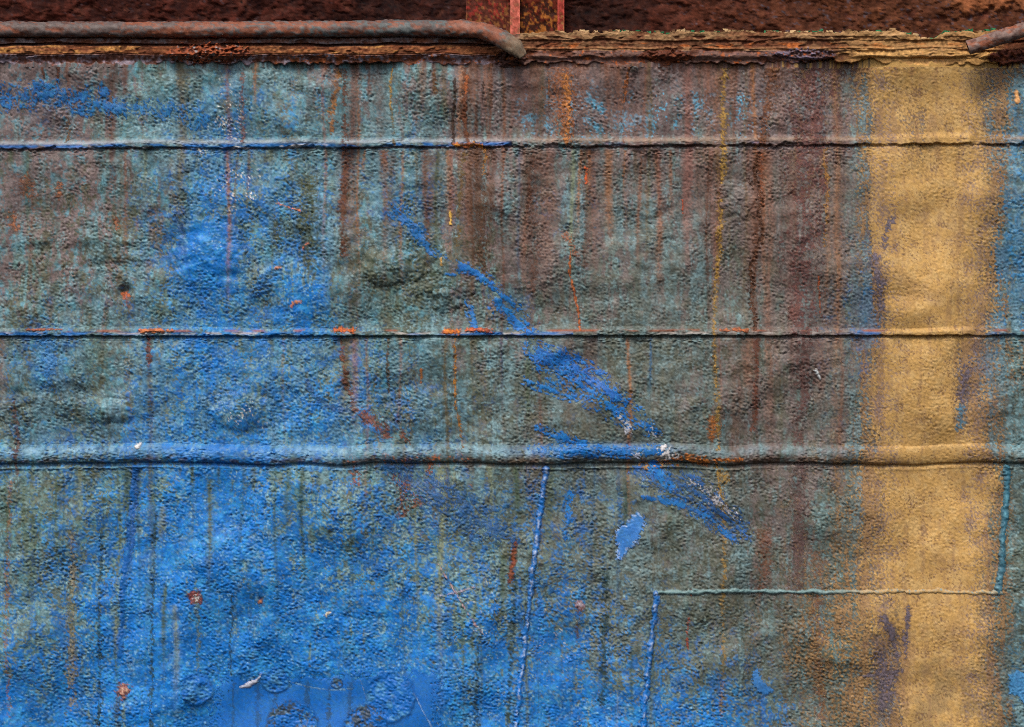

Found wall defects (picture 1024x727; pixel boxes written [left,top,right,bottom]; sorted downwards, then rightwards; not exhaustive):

rust [494,51,528,67]
rust [541,67,583,149]
rust [621,48,693,103]
rust [988,48,1024,67]
rust [327,68,349,257]
rust [451,67,494,274]
rust [757,47,840,445]
rust [568,251,581,331]
rust [138,328,174,366]
rust [333,326,410,443]
rust [188,591,202,671]
rust [114,682,133,727]